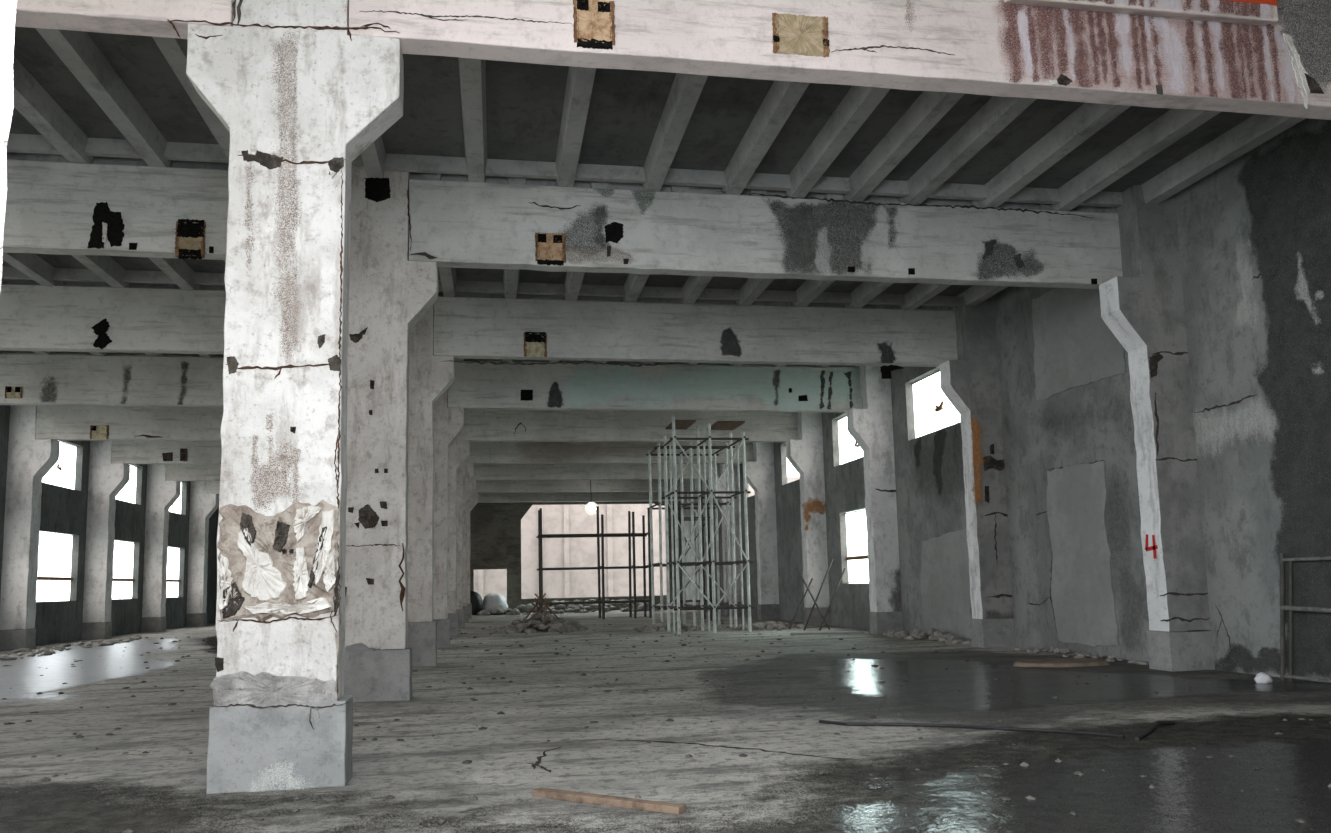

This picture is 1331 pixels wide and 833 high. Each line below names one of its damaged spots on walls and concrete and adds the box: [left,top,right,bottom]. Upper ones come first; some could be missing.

crack [167,0,564,41]
corrosion [994,0,1310,103]
spalling [87,202,137,250]
damp [558,188,637,265]
damp [631,190,656,215]
damp [762,197,899,275]
damp [975,234,1045,280]
spalling [91,318,112,349]
crack [218,154,405,632]
corrosion [802,497,826,531]
flaking render [217,499,388,622]